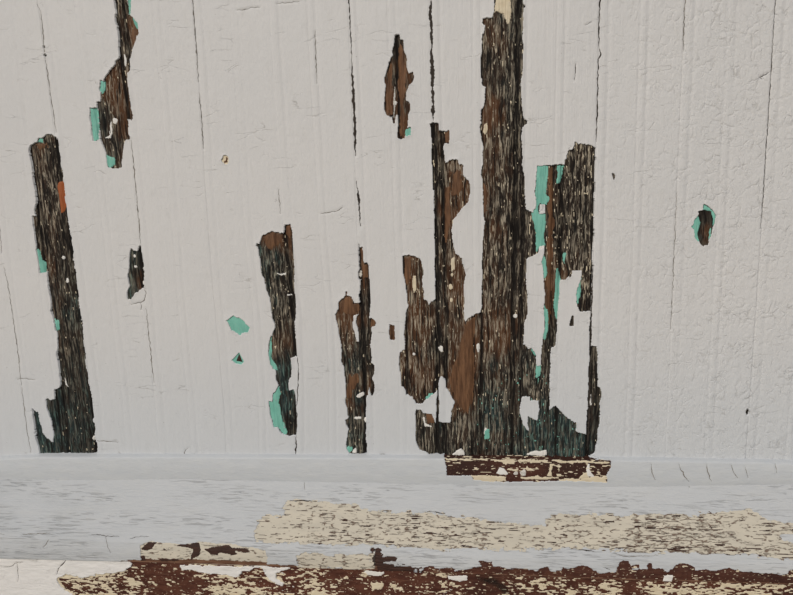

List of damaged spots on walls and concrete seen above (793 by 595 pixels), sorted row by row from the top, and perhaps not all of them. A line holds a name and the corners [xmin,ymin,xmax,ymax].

peeling [90,0,139,169]
peeling [384,35,414,139]
peeling [30,134,98,453]
peeling [127,246,145,299]
peeling [227,316,250,335]
peeling [256,224,297,436]
peeling [335,247,376,454]
peeling [389,0,611,483]
peeling [691,204,716,247]
peeling [57,499,793,595]